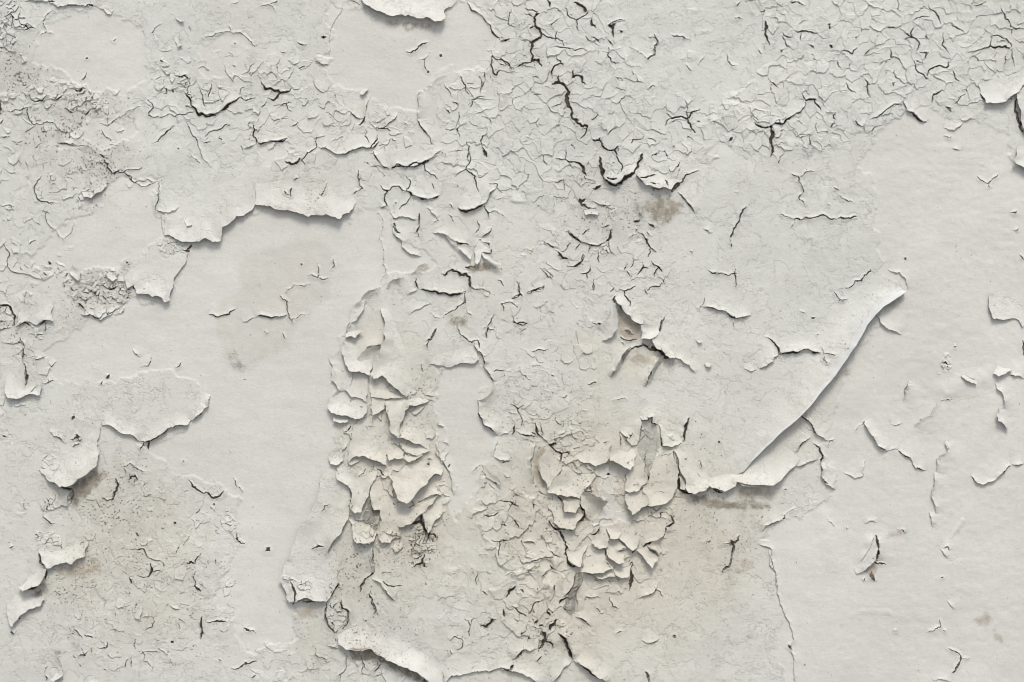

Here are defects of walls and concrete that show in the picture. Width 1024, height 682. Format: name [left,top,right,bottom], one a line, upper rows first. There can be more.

peeling [362,0,510,42]
peeling [0,290,57,399]
peeling [7,390,211,638]
crack [0,0,415,440]
peeling [0,55,507,321]
peeling [279,255,922,682]
crack [338,0,1024,664]
spalling [938,342,977,384]
peeling [989,292,1024,327]
peeling [993,356,1024,430]